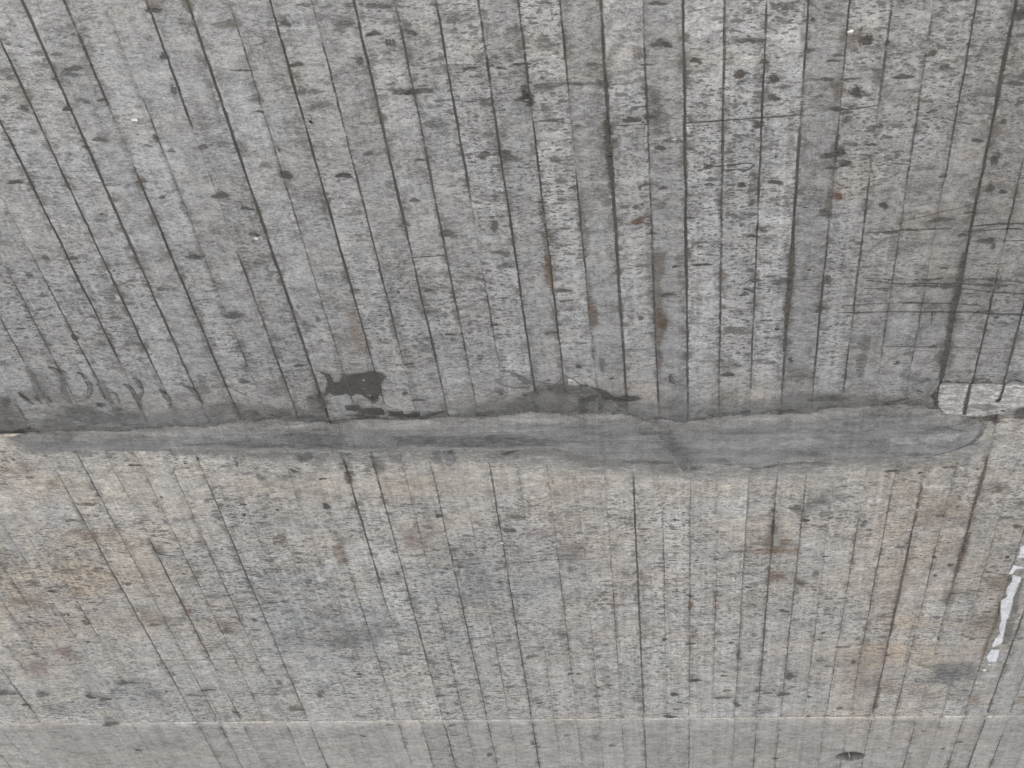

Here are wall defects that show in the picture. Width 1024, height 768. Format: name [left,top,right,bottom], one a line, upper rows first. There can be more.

damp [24,366,147,423]